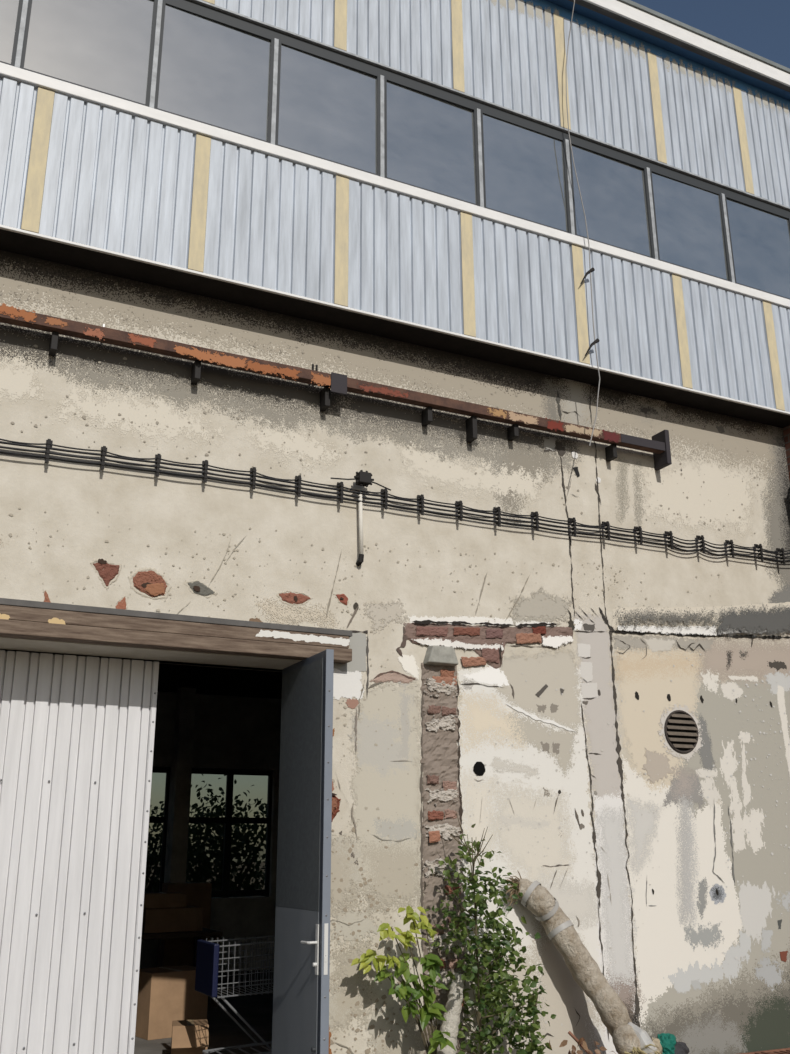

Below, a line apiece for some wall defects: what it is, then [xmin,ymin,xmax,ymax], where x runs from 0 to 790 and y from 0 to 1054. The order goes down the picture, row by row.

corrosion [0,303,67,327]
corrosion [83,327,105,341]
corrosion [128,334,157,348]
corrosion [174,345,331,388]
corrosion [487,408,621,443]
spalling [90,558,218,609]
spalling [276,590,312,606]
crack [326,384,657,1037]
peeling [331,779,369,892]
flaking render [370,615,595,1054]
peeling [330,905,382,948]
peeling [329,986,409,1054]